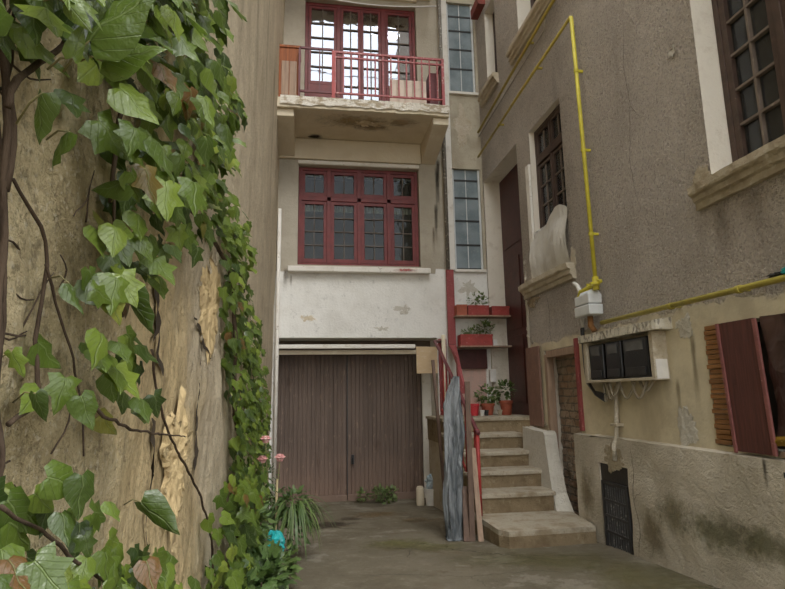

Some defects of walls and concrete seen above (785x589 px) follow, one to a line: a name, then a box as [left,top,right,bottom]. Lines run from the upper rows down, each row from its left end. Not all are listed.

flaking render [196,249,221,366]
flaking render [159,385,193,519]